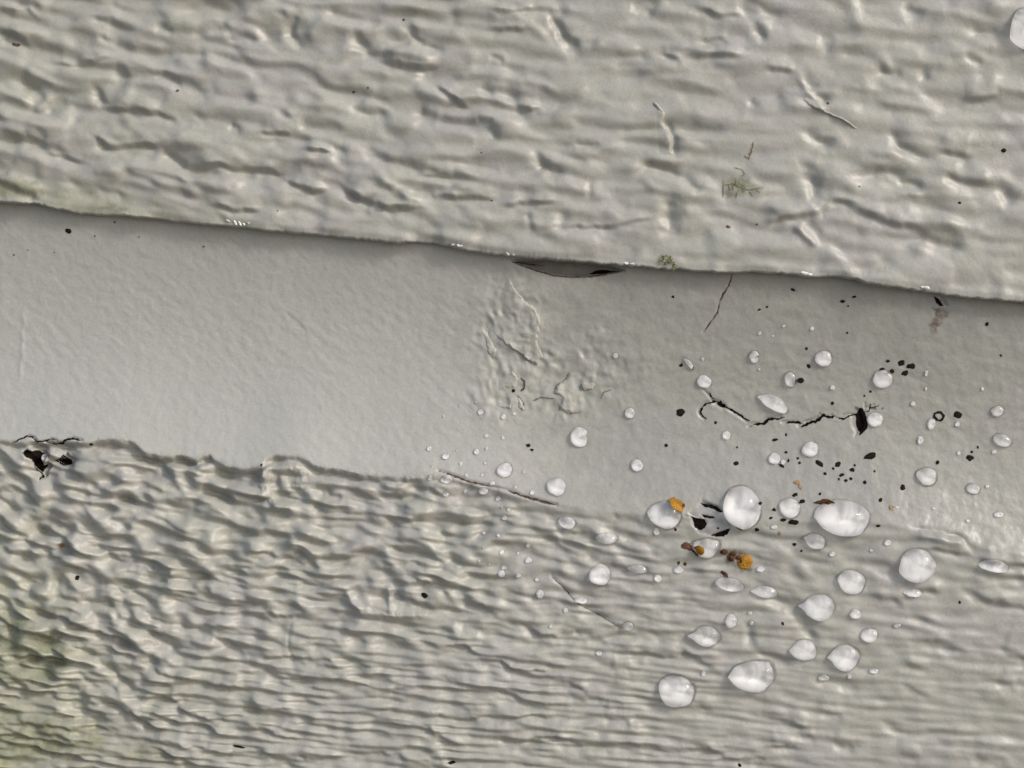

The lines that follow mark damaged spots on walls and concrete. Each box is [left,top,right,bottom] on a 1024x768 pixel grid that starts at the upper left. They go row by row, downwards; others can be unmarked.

peeling [480,276,543,365]
crack [705,275,732,330]
crack [700,392,884,436]
peeling [41,447,63,465]
spalling [686,500,741,537]